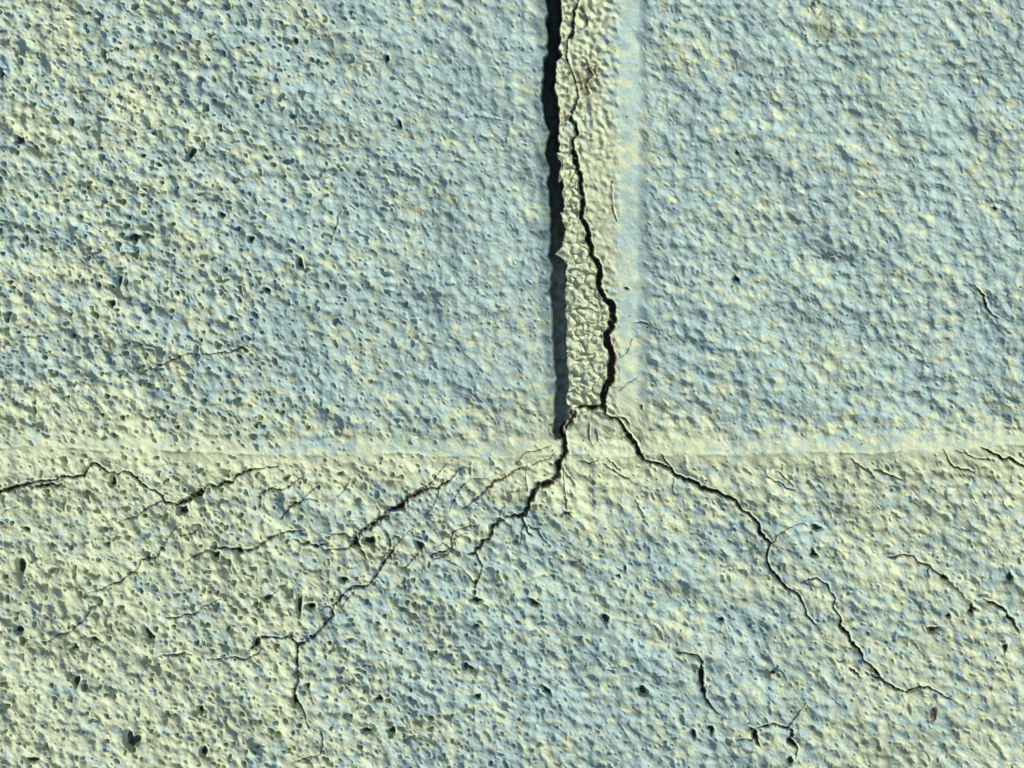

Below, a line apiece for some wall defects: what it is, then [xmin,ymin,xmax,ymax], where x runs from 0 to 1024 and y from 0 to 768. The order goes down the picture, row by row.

crack [974,285,998,318]
crack [141,346,250,374]
crack [158,0,951,762]
crack [943,447,1024,473]
crack [0,462,279,642]
crack [888,554,1020,633]